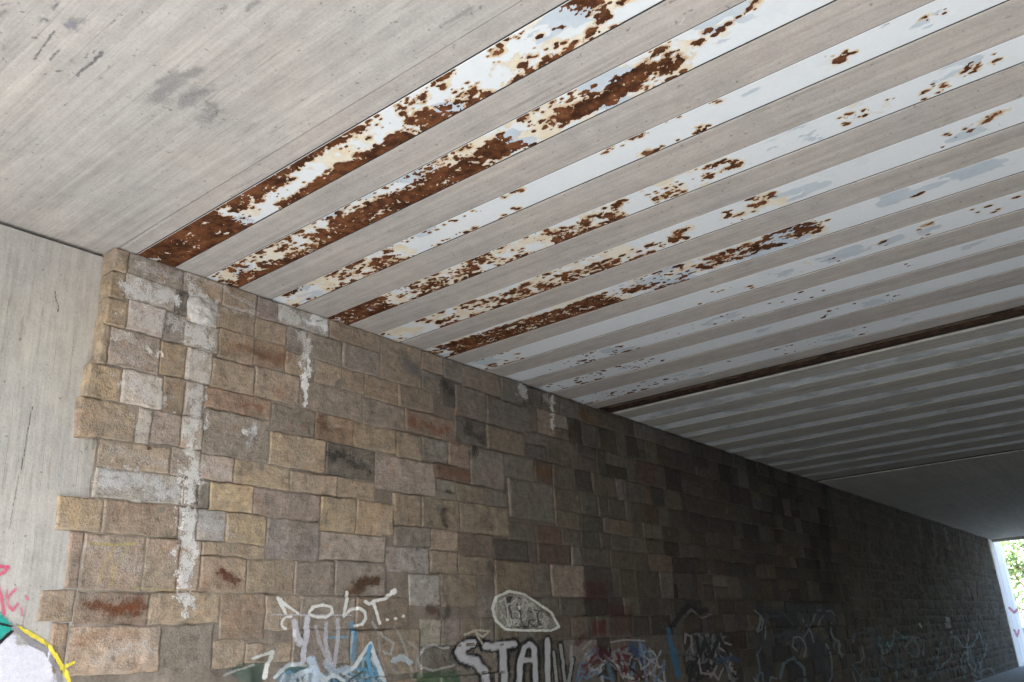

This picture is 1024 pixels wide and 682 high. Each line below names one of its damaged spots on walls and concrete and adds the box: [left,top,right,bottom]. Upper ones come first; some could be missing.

efflorescence [276,305,329,407]
corrosion [138,70,492,267]
peeling [276,210,481,307]
peeling [122,0,765,286]
corrosion [328,199,629,325]
corrosion [211,0,759,291]
peeling [327,157,751,324]
corrosion [415,219,830,370]
corrosion [832,50,859,64]
peeling [909,9,949,30]
peeling [918,52,1005,102]
water stain [75,261,259,619]